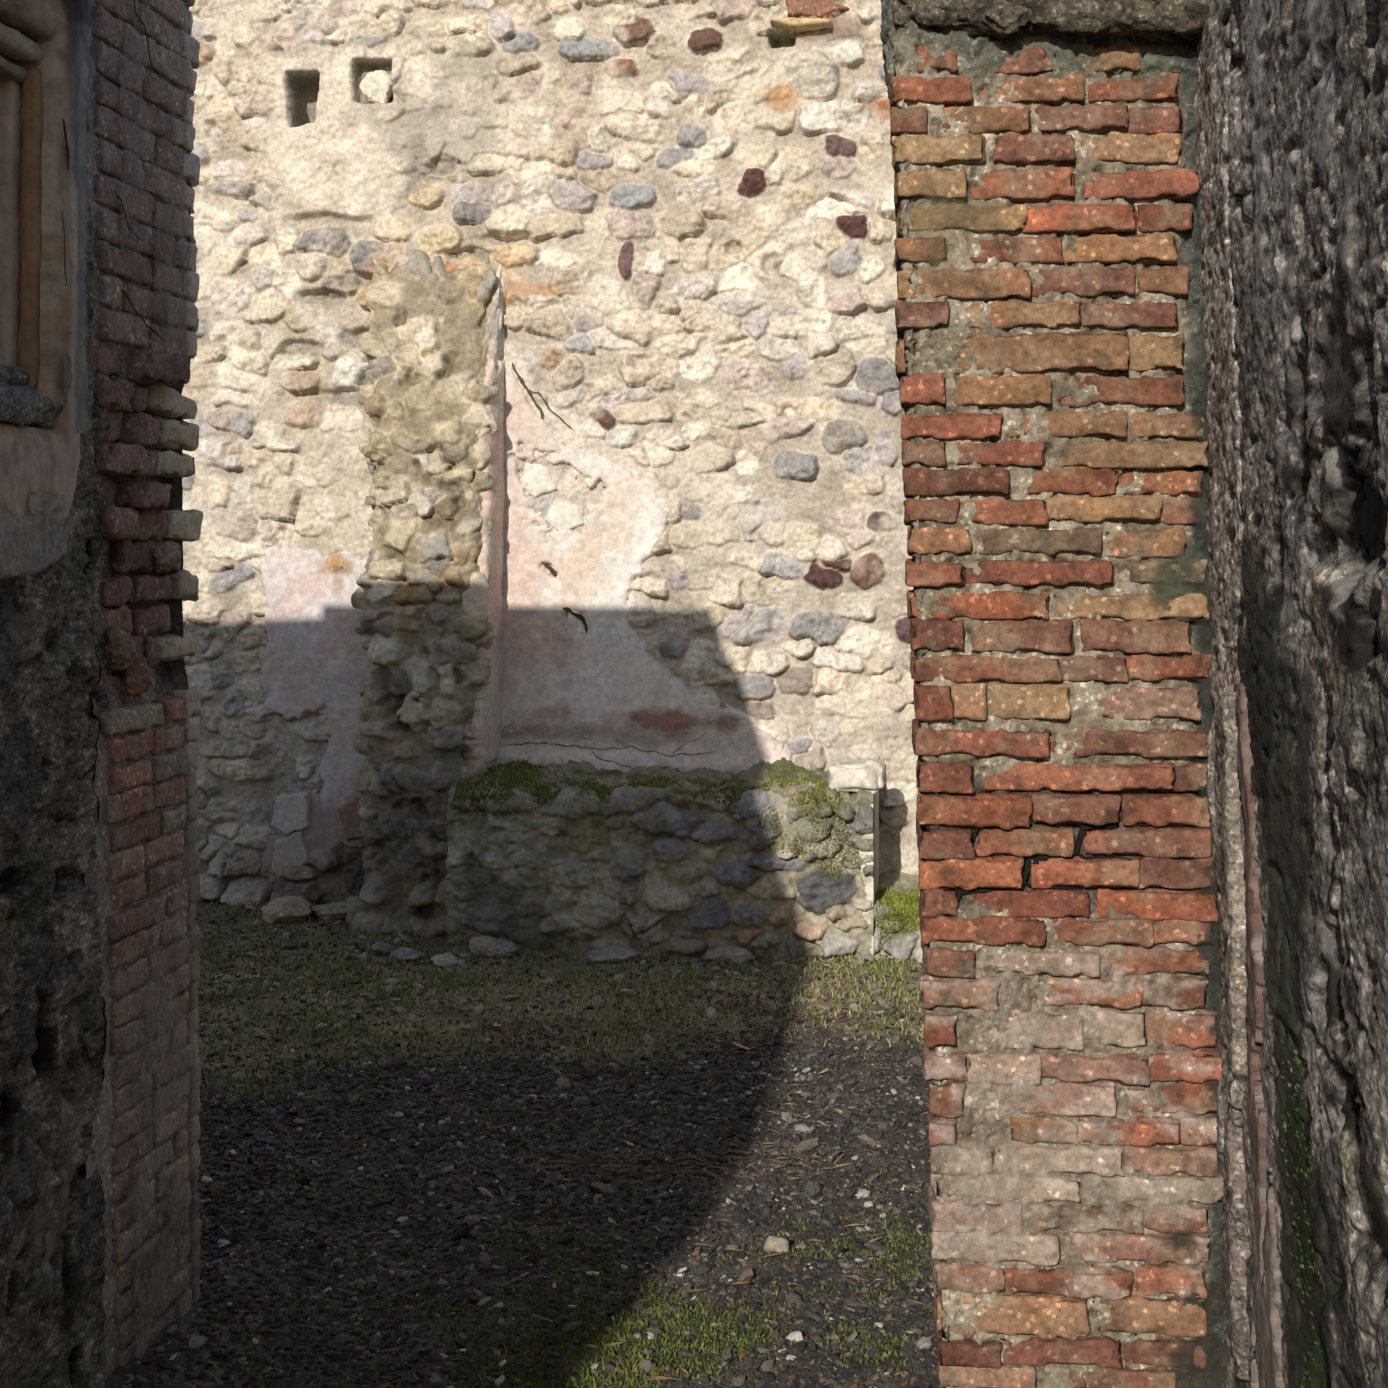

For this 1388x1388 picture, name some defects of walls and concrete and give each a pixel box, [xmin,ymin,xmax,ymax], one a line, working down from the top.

crack [1229,54,1237,71]
crack [1228,181,1256,422]
peeling [0,491,74,576]
spalling [93,343,191,703]
peeling [406,354,793,775]
peeling [257,544,430,883]
crack [1321,662,1346,908]